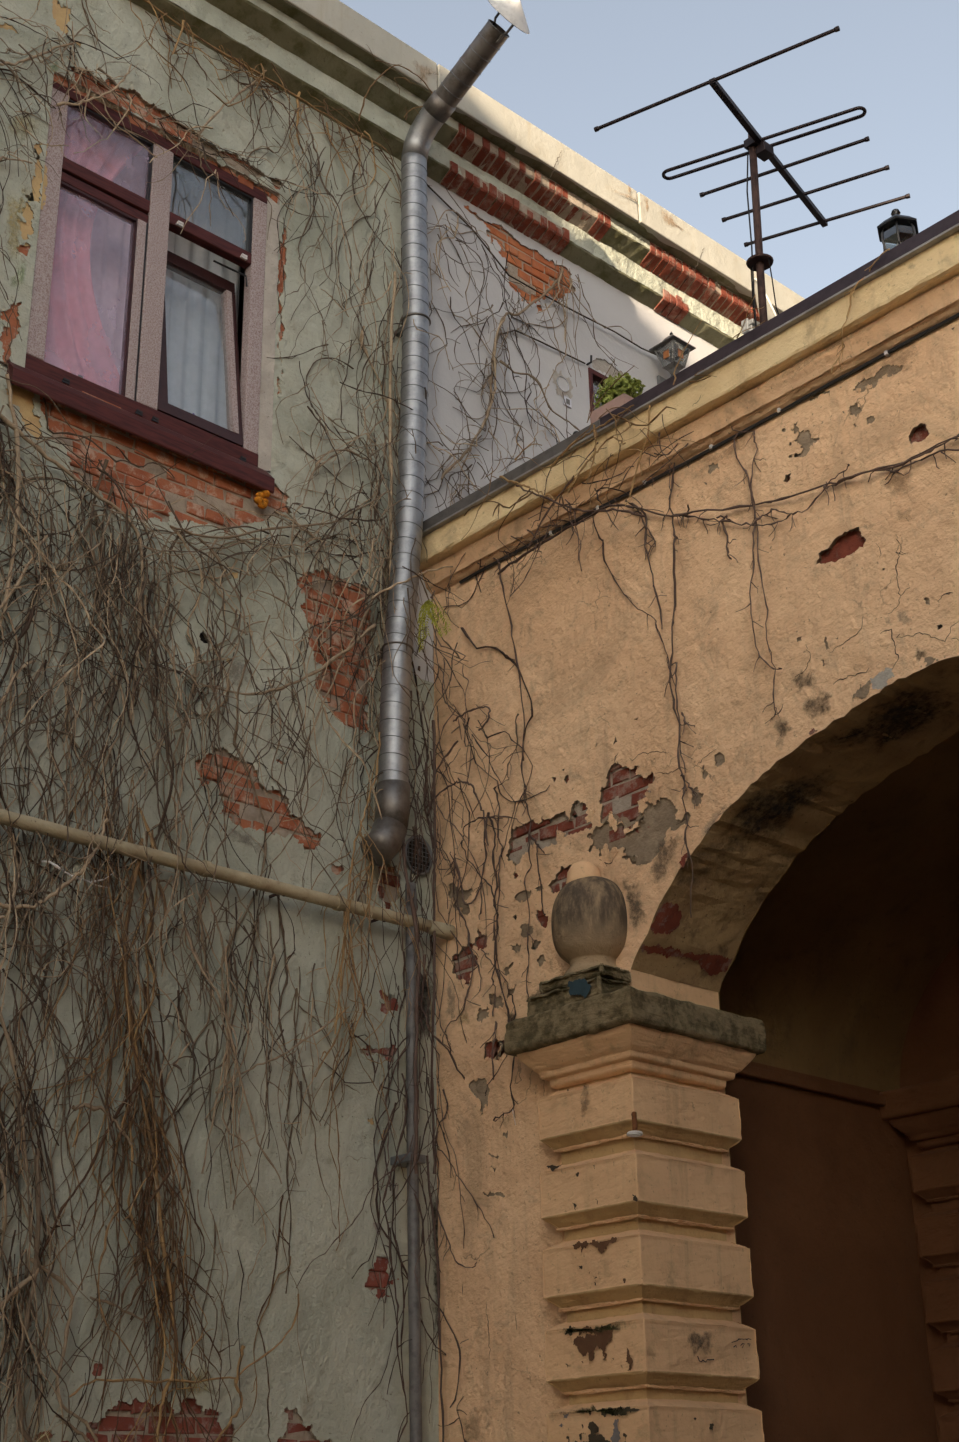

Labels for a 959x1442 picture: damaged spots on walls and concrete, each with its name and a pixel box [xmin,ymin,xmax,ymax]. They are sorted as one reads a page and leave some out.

flaking render [439,123,611,312]
flaking render [0,296,292,533]
flaking render [817,527,866,564]
flaking render [297,567,376,739]
flaking render [194,745,344,875]
flaking render [448,882,494,986]
flaking render [477,752,733,1023]
flaking render [469,1035,506,1114]
peeling [565,1325,633,1371]
flaking render [86,1393,235,1442]
flaking render [277,1407,332,1442]
peeling [559,1406,640,1442]